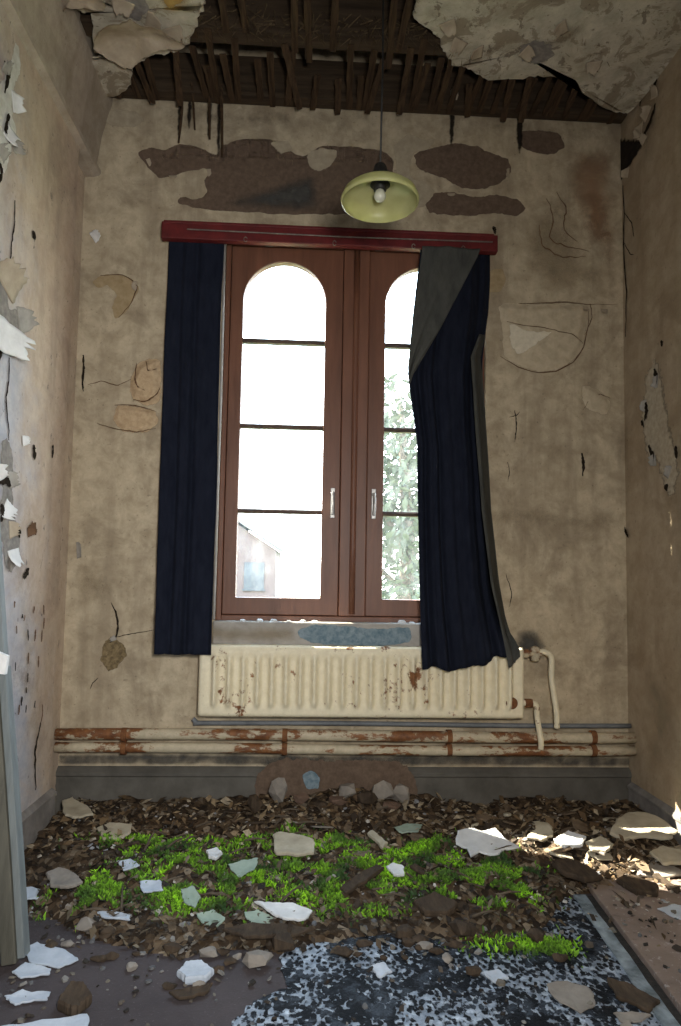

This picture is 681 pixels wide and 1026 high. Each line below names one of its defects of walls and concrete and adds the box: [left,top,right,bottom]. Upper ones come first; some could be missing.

peeling [61,0,185,69]
peeling [0,43,27,182]
peeling [138,139,394,215]
peeling [414,143,525,216]
peeling [522,130,565,155]
peeling [0,257,39,361]
peeling [0,435,37,580]